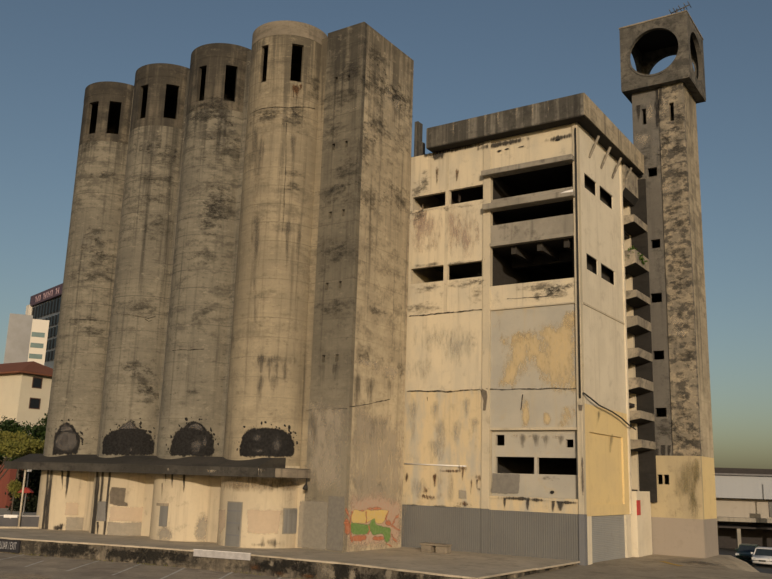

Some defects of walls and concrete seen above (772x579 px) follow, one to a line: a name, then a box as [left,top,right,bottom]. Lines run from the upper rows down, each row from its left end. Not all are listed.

peeling [501,312,576,391]
damp [41,470,70,529]
damp [91,472,111,535]
damp [40,542,97,558]
damp [106,547,189,564]
damp [252,558,316,577]
damp [332,564,377,579]
damp [397,571,440,579]